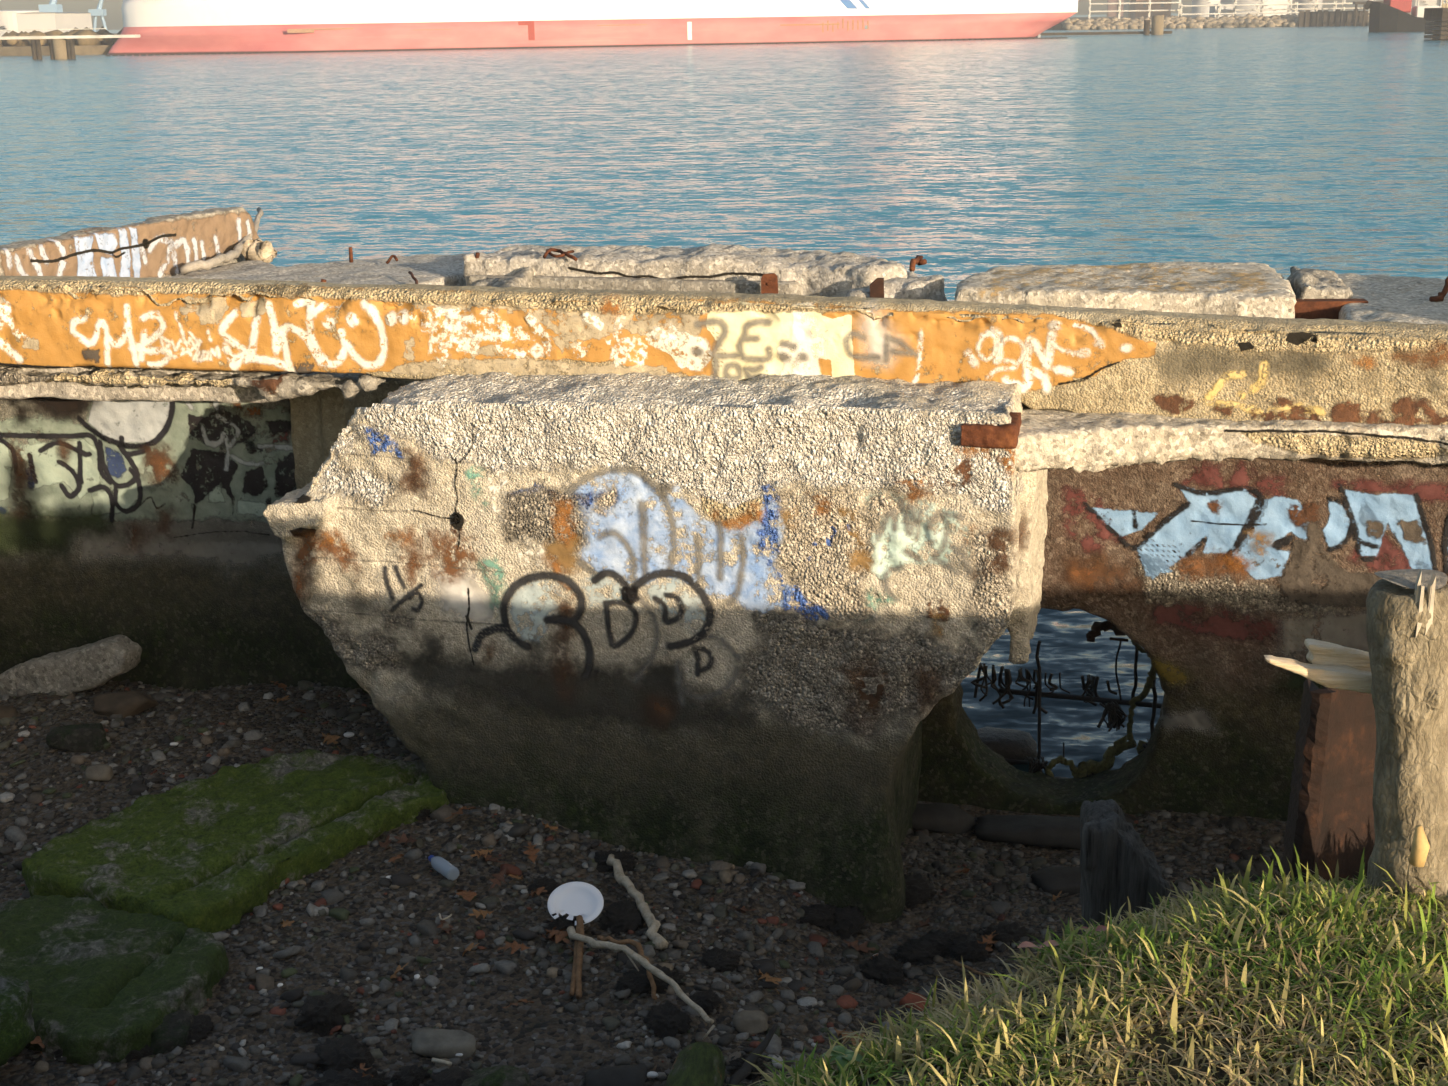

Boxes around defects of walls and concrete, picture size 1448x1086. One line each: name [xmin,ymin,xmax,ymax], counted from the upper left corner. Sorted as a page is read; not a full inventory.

corrosion [1154,394,1195,415]
corrosion [1214,405,1233,416]
corrosion [1250,396,1448,426]
spalling [0,255,1026,736]
leakage [0,508,108,557]
spalling [1086,620,1128,642]
leakage [404,638,754,731]